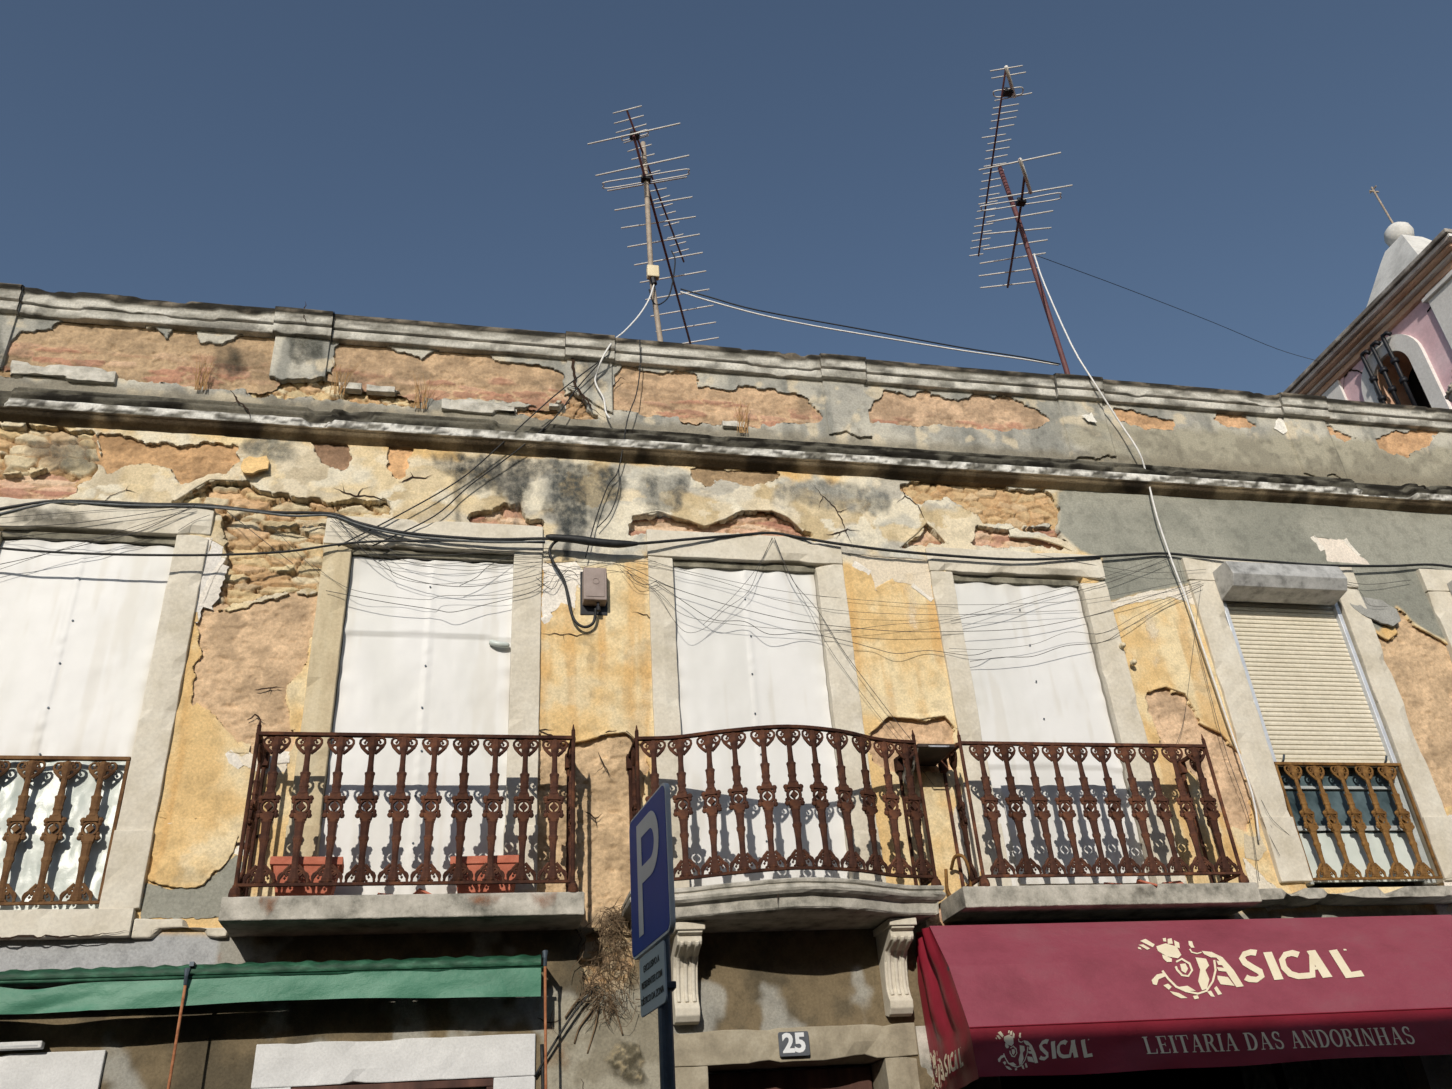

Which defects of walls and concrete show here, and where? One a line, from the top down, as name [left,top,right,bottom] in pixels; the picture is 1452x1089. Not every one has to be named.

spalling [0,322,596,420]
spalling [612,366,823,430]
spalling [868,391,1050,432]
spalling [1376,430,1438,458]
spalling [0,426,390,782]
leakage [449,454,622,560]
peeling [541,556,583,624]
leakage [647,478,685,511]
spalling [847,484,1073,602]
peeling [1111,585,1195,609]
spalling [1350,597,1452,820]
spalling [537,726,649,994]